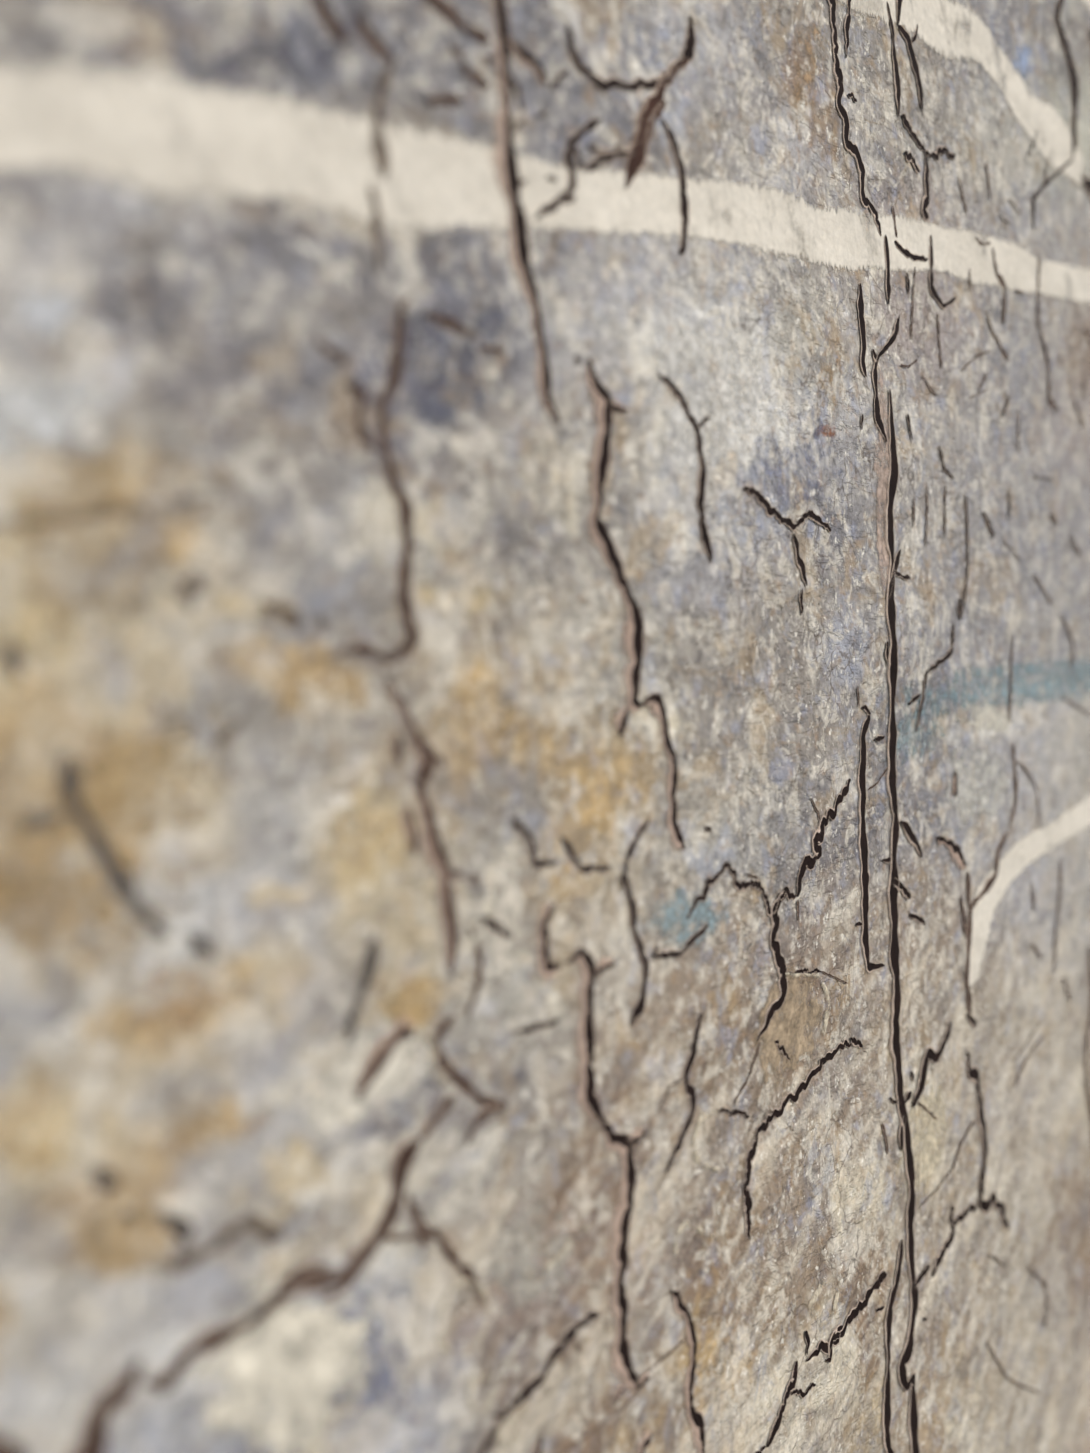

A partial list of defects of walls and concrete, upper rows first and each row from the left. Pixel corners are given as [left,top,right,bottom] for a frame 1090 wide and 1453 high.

crack [313,0,396,272]
crack [1,641,21,683]
crack [21,752,214,960]
crack [72,295,512,1453]
crack [424,0,1090,1453]
crack [0,1435,27,1453]